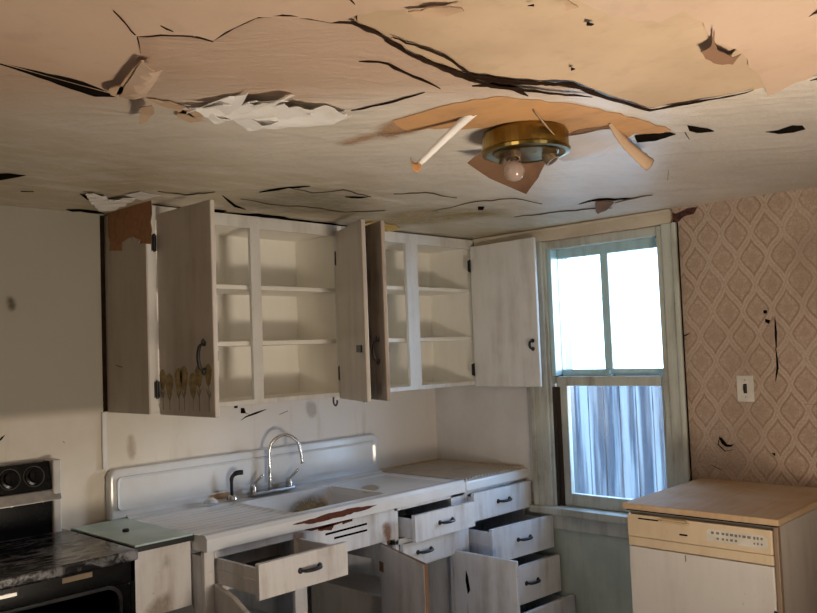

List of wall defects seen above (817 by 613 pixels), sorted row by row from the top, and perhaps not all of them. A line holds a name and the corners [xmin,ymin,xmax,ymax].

crack [0,63,115,97]
peeling [0,0,817,124]
crack [113,0,754,140]
peeling [392,97,676,172]
crack [768,125,805,134]
crack [259,185,310,193]
peeling [468,151,545,194]
peeling [108,200,152,251]
crack [214,195,347,227]
crack [763,310,779,382]
rust [293,498,375,539]